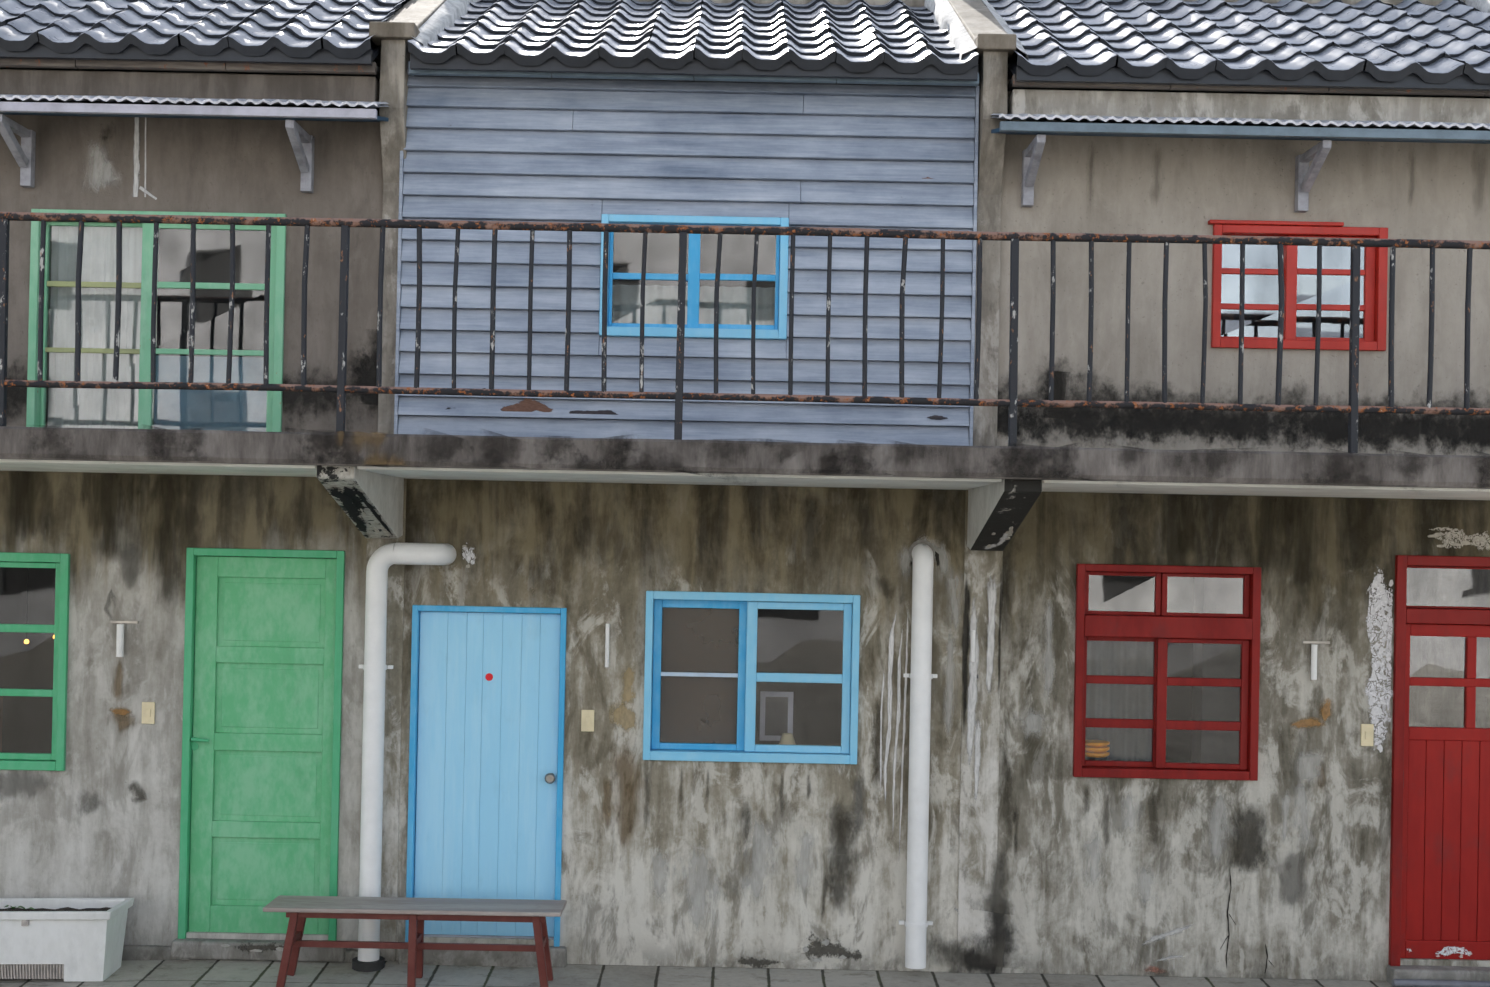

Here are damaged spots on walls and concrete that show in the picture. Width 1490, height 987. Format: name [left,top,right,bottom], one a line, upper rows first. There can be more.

peeling [327,486,393,537]
peeling [985,526,1013,549]
damp [997,366,1490,568]
damp [1257,496,1314,586]
damp [962,574,1003,799]
peeling [1364,565,1393,753]
damp [603,755,649,844]
damp [798,615,908,914]
damp [938,754,1018,974]
damp [1089,797,1159,879]
damp [1211,795,1264,868]
damp [1282,856,1305,903]